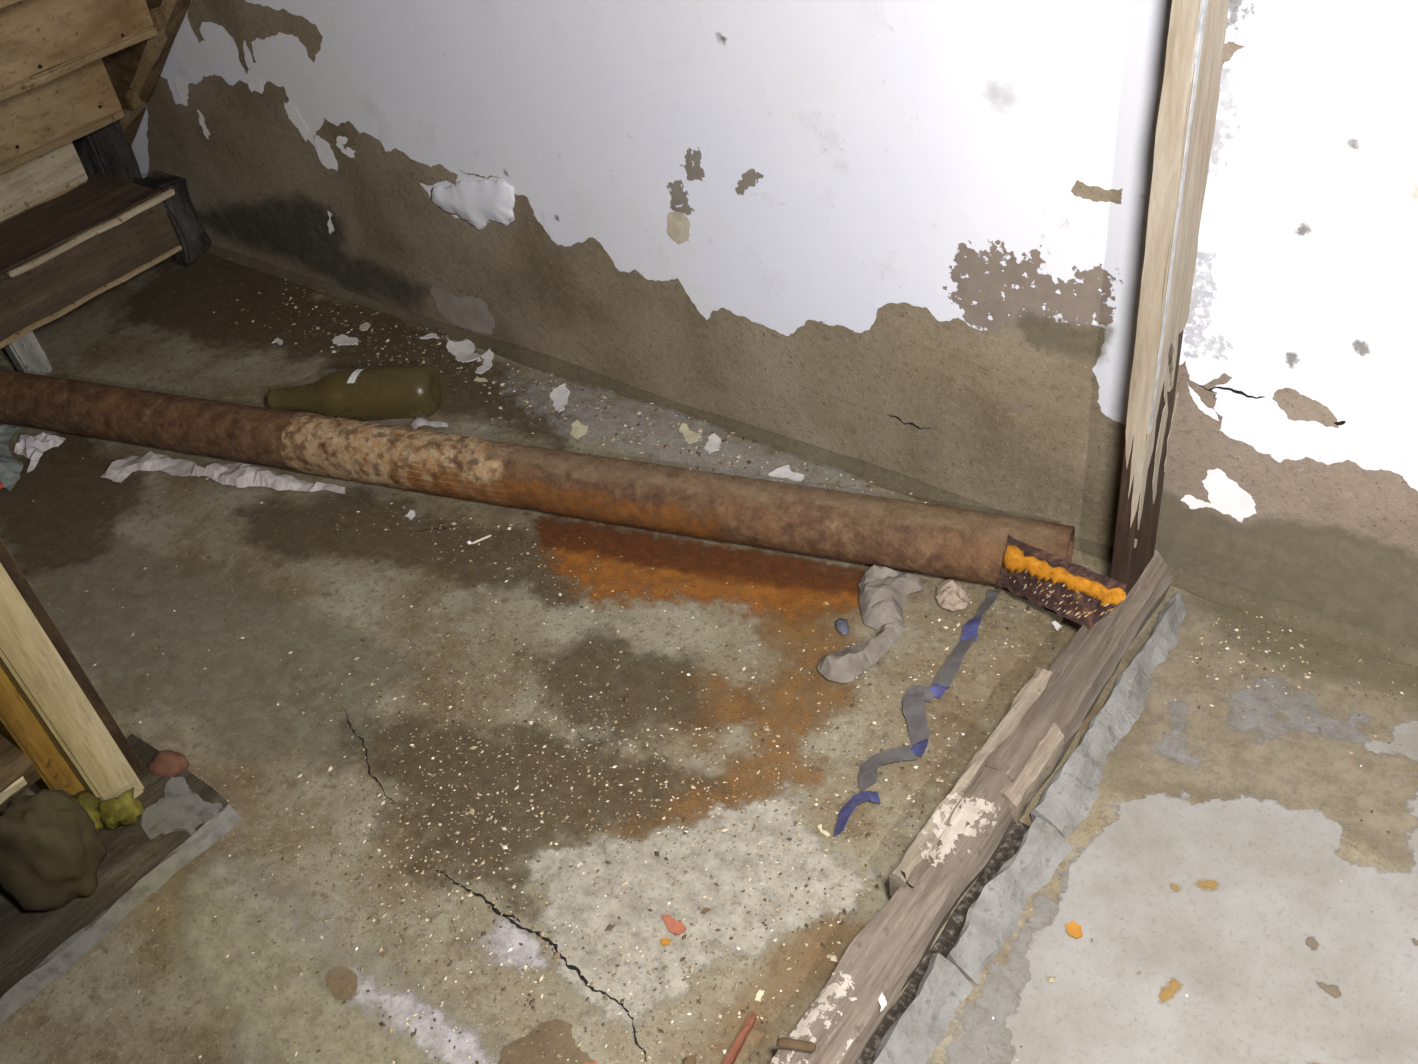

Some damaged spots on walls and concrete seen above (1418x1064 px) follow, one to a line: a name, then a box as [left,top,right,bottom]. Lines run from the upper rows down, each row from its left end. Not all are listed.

peeling [146,0,1126,548]
water stain [0,432,143,577]
water stain [503,381,868,495]
peeling [1162,344,1418,567]
rust [536,517,865,835]
crack [341,707,394,801]
crack [436,870,647,1062]
spalling [1306,937,1319,950]
spalling [1317,982,1341,998]